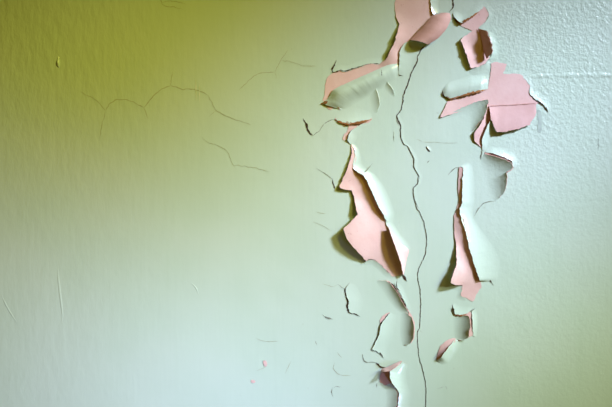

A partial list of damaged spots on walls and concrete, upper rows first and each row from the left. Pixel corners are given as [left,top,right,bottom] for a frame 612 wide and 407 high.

crack [83,72,248,135]
crack [393,46,427,407]
peeling [303,0,551,407]